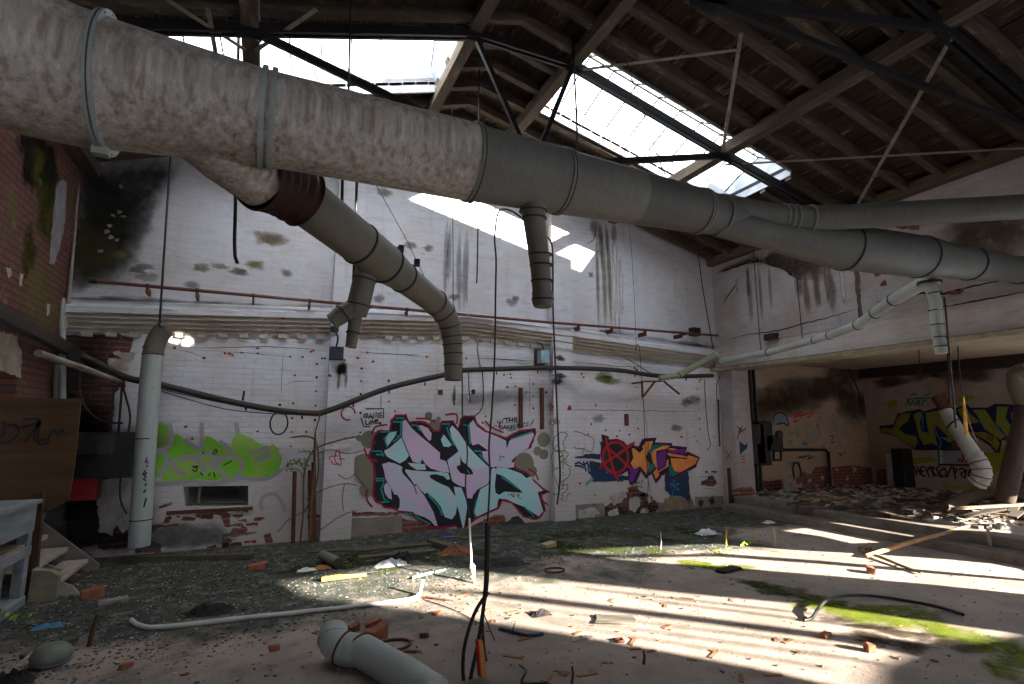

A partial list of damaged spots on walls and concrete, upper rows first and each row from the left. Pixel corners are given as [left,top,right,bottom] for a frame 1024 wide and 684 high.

peeling [49,180,67,265]
damp [73,160,172,280]
damp [256,232,286,245]
damp [196,262,261,274]
damp [589,224,623,323]
damp [722,252,845,306]
flaking render [66,333,135,432]
damp [753,368,866,421]
peeling [86,478,273,554]
flaking render [604,486,696,512]
flaking render [732,480,783,503]
flaking render [795,465,887,488]